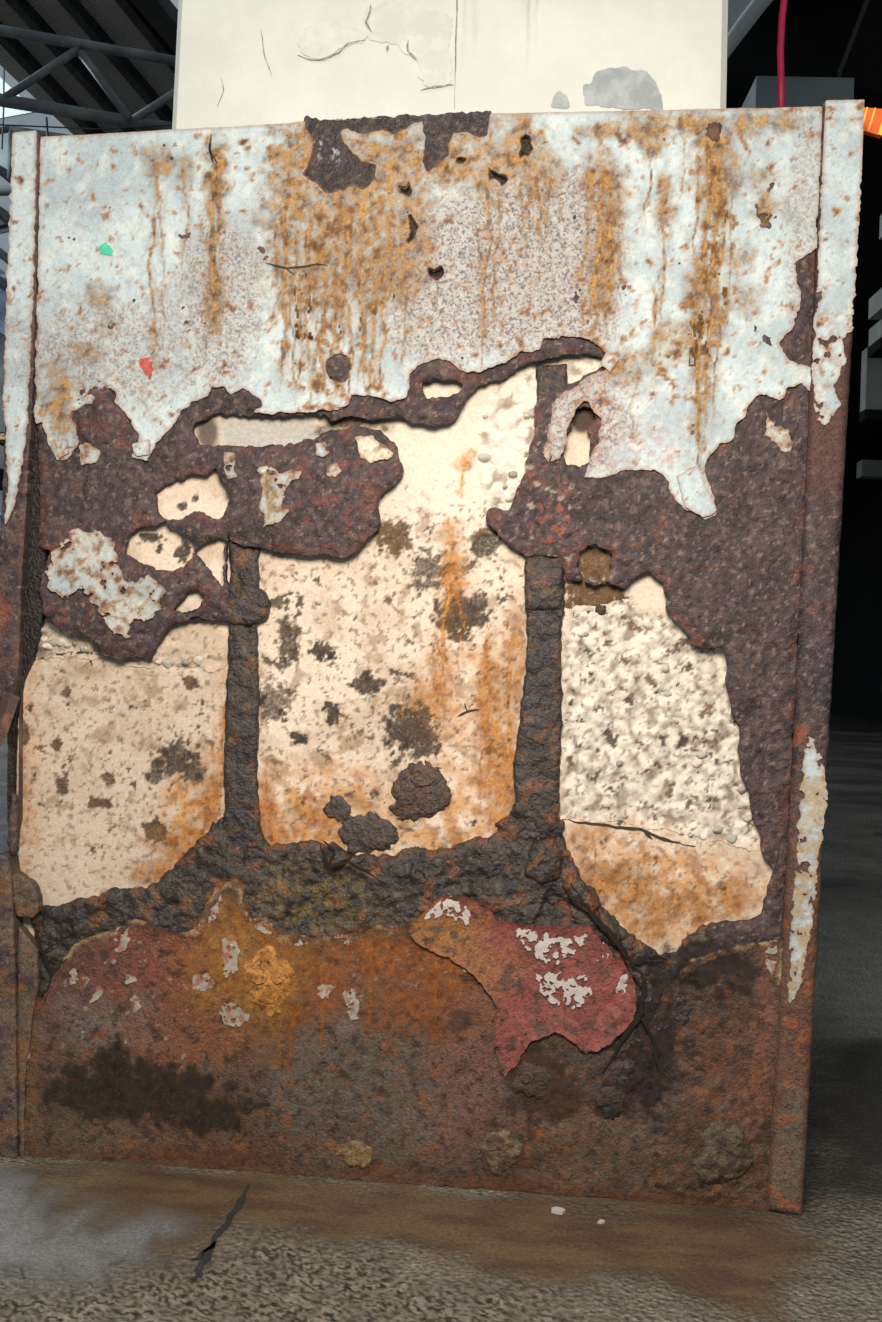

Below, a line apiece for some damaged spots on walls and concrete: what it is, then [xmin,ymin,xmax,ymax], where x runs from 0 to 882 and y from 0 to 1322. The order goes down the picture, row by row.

rust [261,116,562,397]
peeling [2,66,864,527]
rust [536,364,568,401]
rust [579,111,795,468]
peeling [191,938,241,991]
rust [132,541,336,883]
peeling [316,984,360,1020]
rust [301,503,629,855]
peeling [409,837,647,1078]
crack [563,819,695,847]
peeling [765,736,828,1003]
crack [191,1185,249,1284]